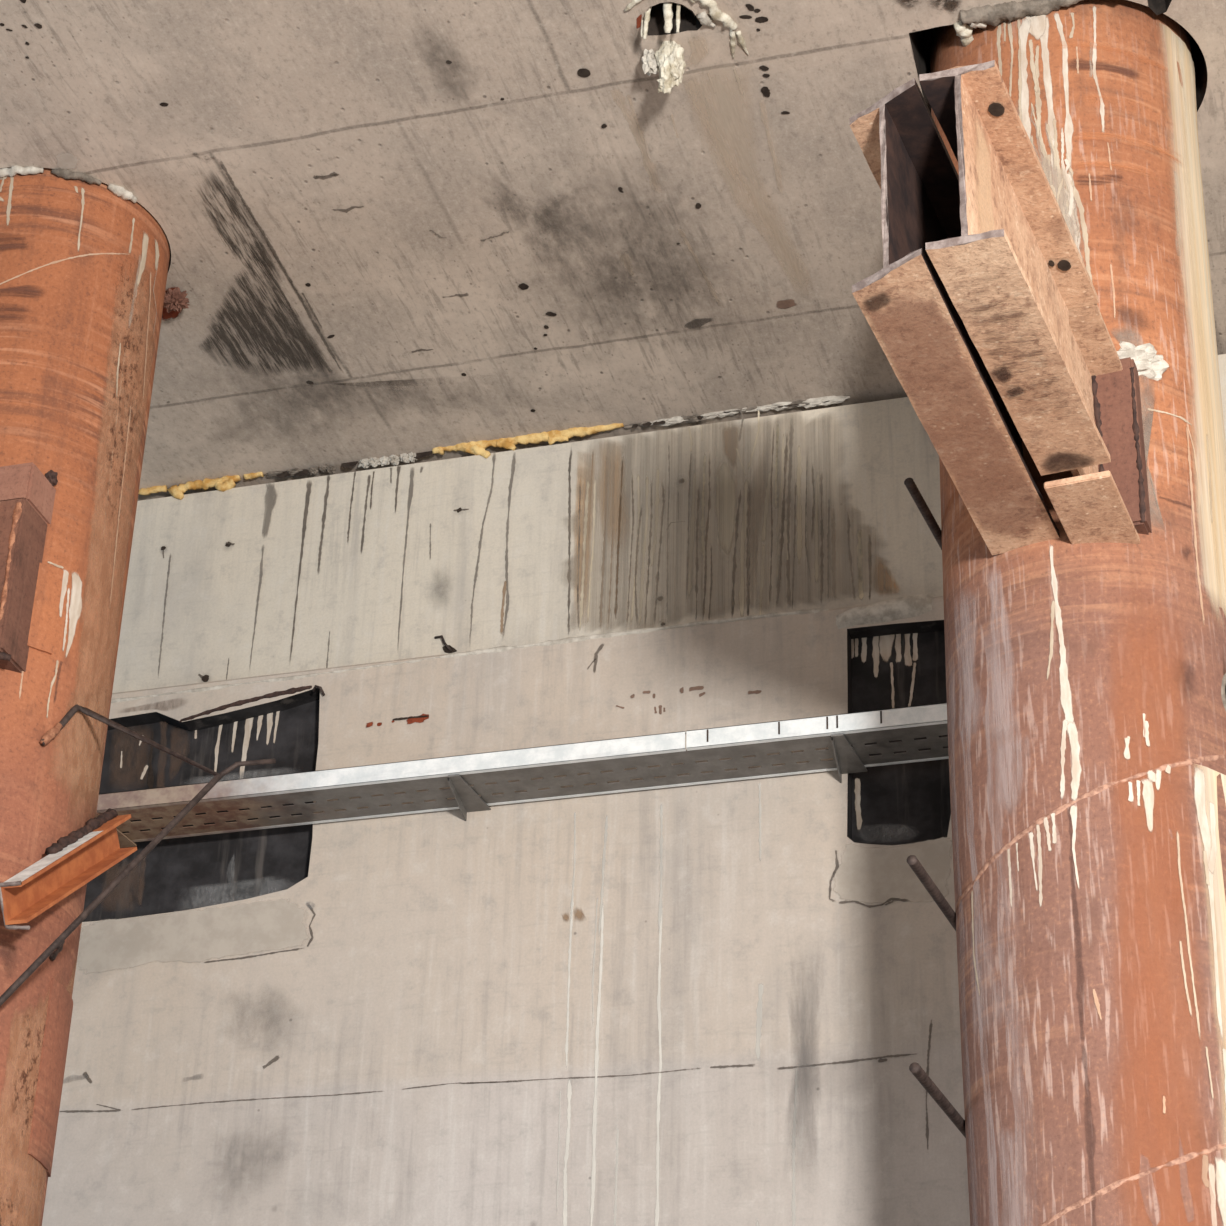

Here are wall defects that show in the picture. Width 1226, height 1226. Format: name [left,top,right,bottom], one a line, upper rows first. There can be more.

corrosion [1070,61,1135,77]
corrosion [109,284,143,488]
damp [158,550,171,674]
damp [250,484,276,663]
damp [290,475,330,658]
damp [347,471,375,552]
damp [390,466,423,643]
damp [470,455,495,635]
damp [500,456,516,633]
damp [567,410,896,630]
crack [829,851,908,908]
corrosion [15,1027,45,1125]